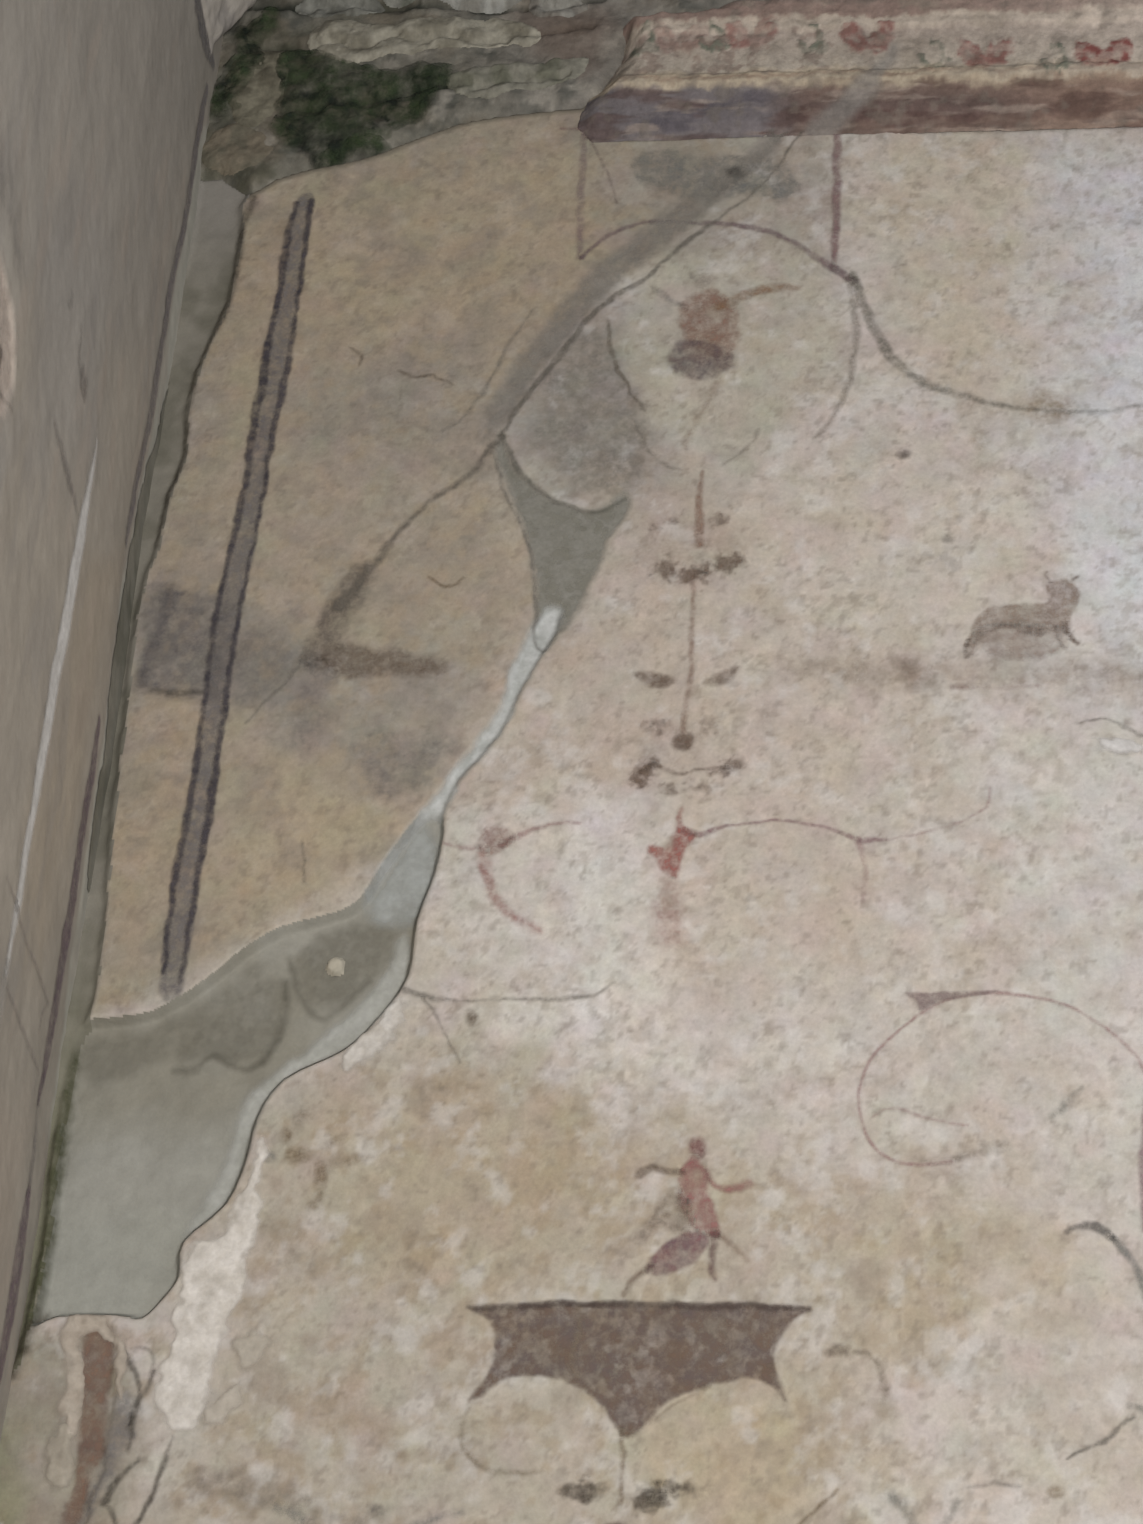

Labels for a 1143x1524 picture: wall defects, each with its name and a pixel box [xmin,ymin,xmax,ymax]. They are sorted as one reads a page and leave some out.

flaking render [13,0,737,1487]